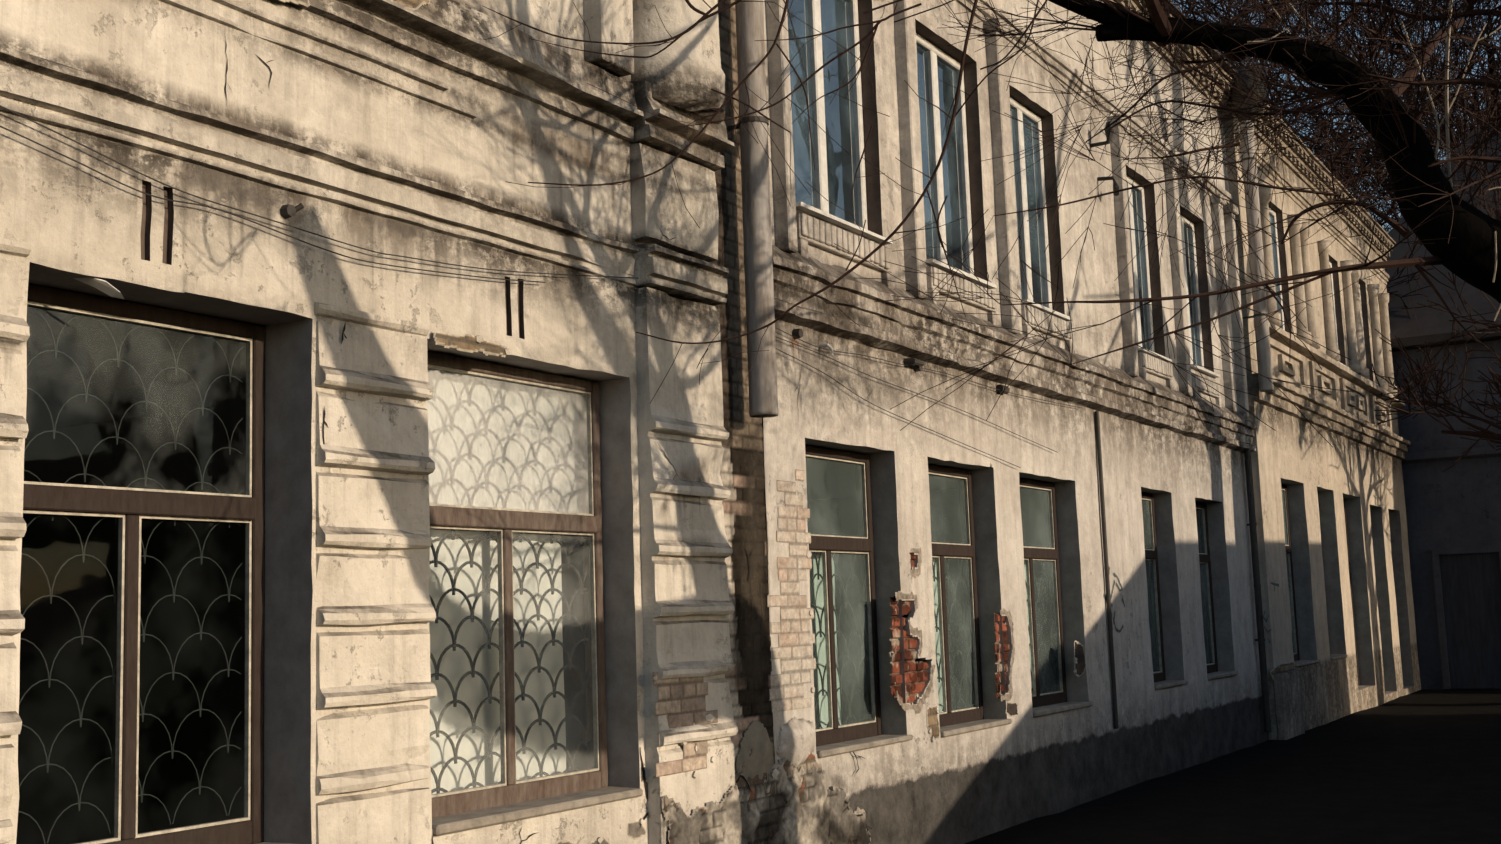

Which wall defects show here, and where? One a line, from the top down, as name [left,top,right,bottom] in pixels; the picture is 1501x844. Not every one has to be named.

spalling [767,469,816,712]
spalling [888,596,940,742]
spalling [994,613,1020,717]
spalling [652,672,718,778]
peeling [627,818,646,840]
spalling [661,747,871,844]